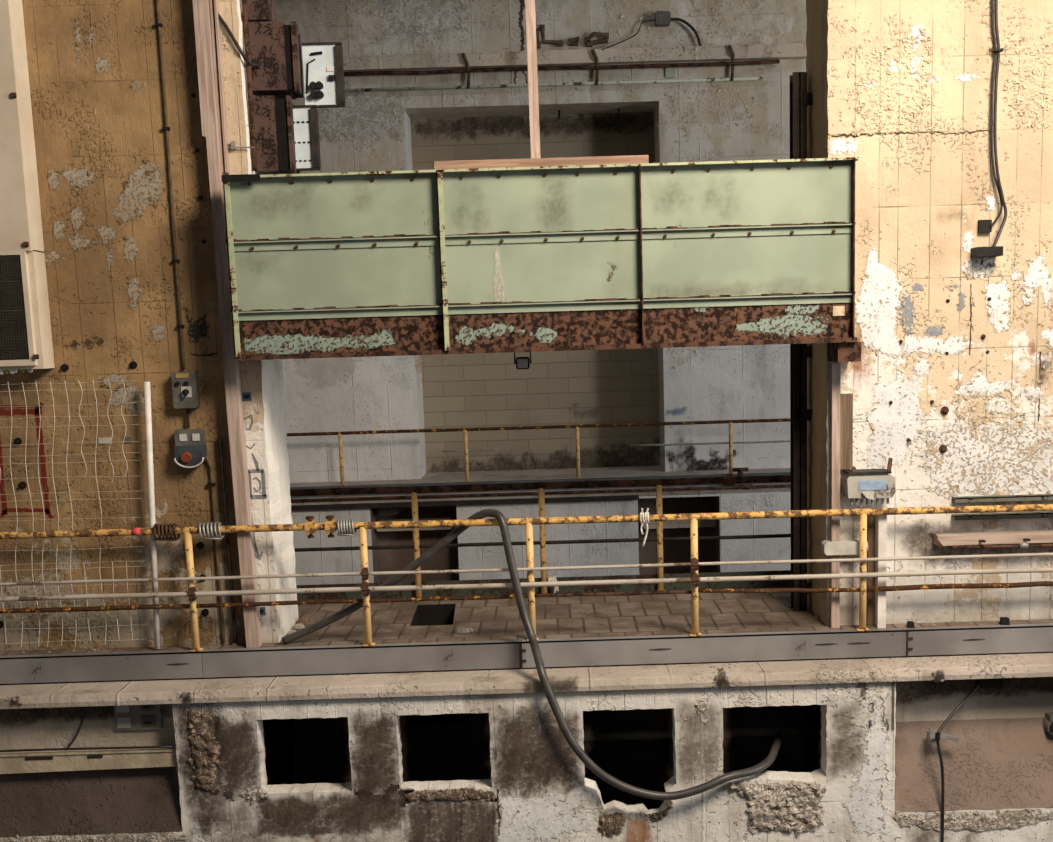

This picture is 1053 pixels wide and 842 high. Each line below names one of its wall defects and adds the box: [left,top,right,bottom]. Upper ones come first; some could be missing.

peeling [829,23,942,156]
peeling [45,158,166,311]
corrosion [230,291,862,372]
peeling [855,243,1053,500]
peeling [985,194,998,212]
peeling [948,206,1053,335]
water stain [525,677,577,692]
water stain [178,703,258,834]
water stain [258,716,496,842]
water stain [495,704,582,797]
spalling [647,800,673,822]
spalling [728,779,827,835]